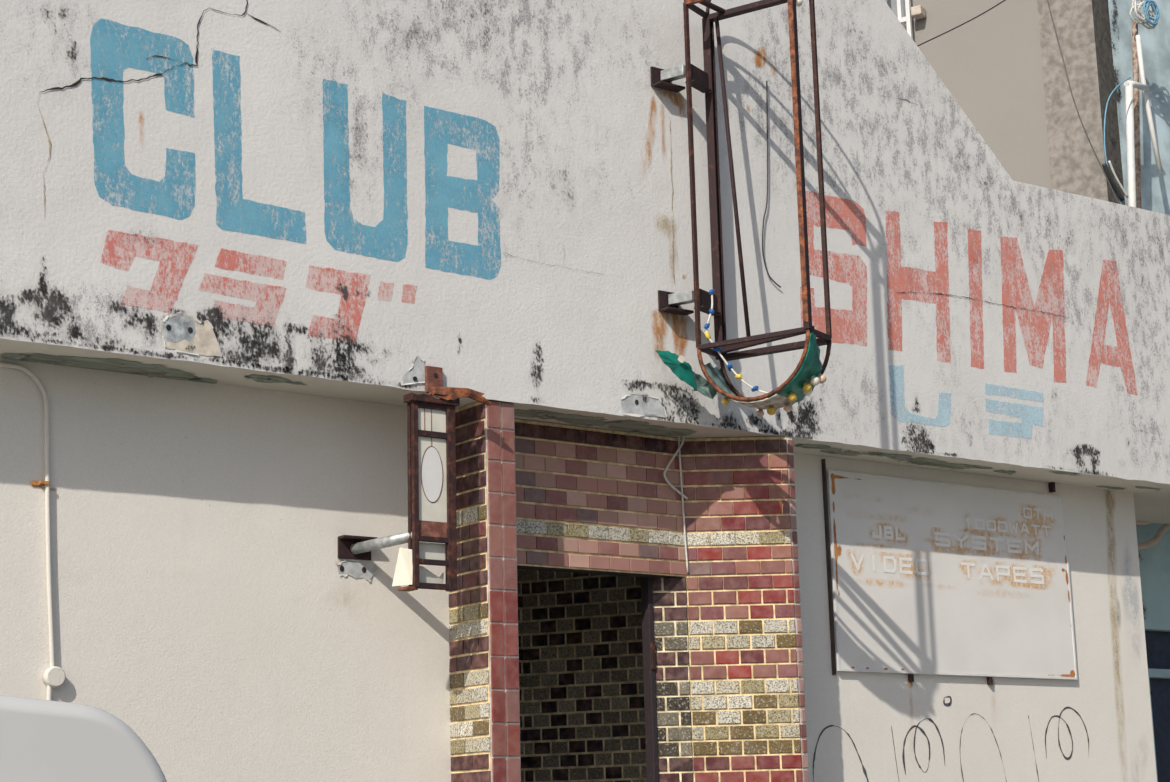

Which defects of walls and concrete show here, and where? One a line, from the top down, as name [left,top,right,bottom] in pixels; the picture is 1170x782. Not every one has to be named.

corrosion [756,50,774,73]
crack [37,0,281,217]
corrosion [650,92,683,124]
water stain [0,257,195,359]
crack [896,291,1065,317]
peeling [0,353,218,384]
spalling [161,312,223,357]
water stain [197,304,417,388]
corrosion [654,312,686,350]
water stain [625,379,823,439]
water stain [902,401,957,456]
water stain [1044,444,1107,475]